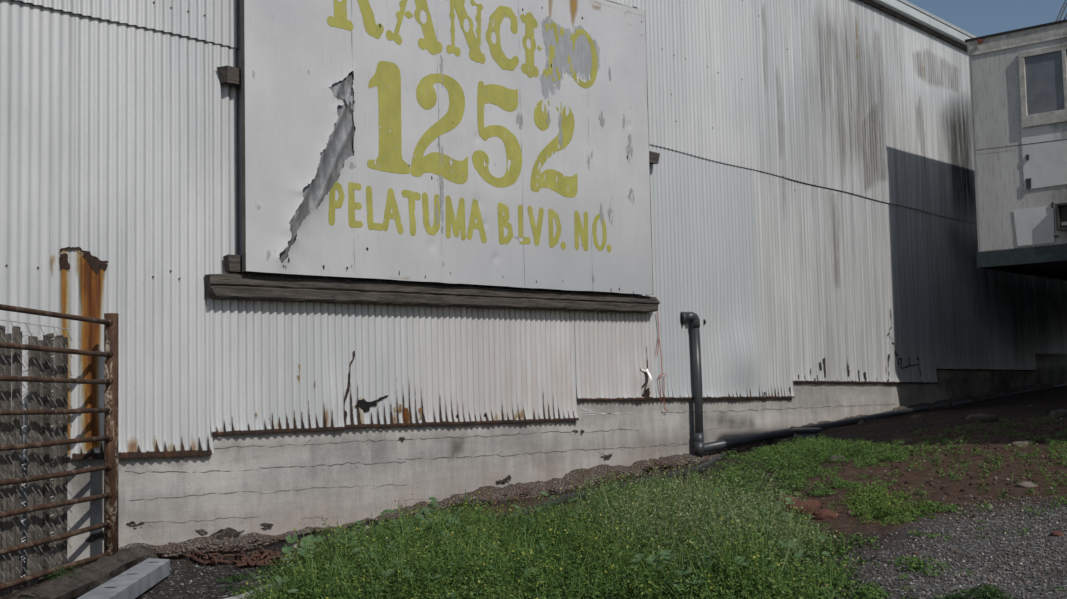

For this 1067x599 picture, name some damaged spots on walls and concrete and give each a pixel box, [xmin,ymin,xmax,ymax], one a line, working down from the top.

damp [951,111,974,204]
corrosion [51,247,109,460]
corrosion [119,358,1036,459]